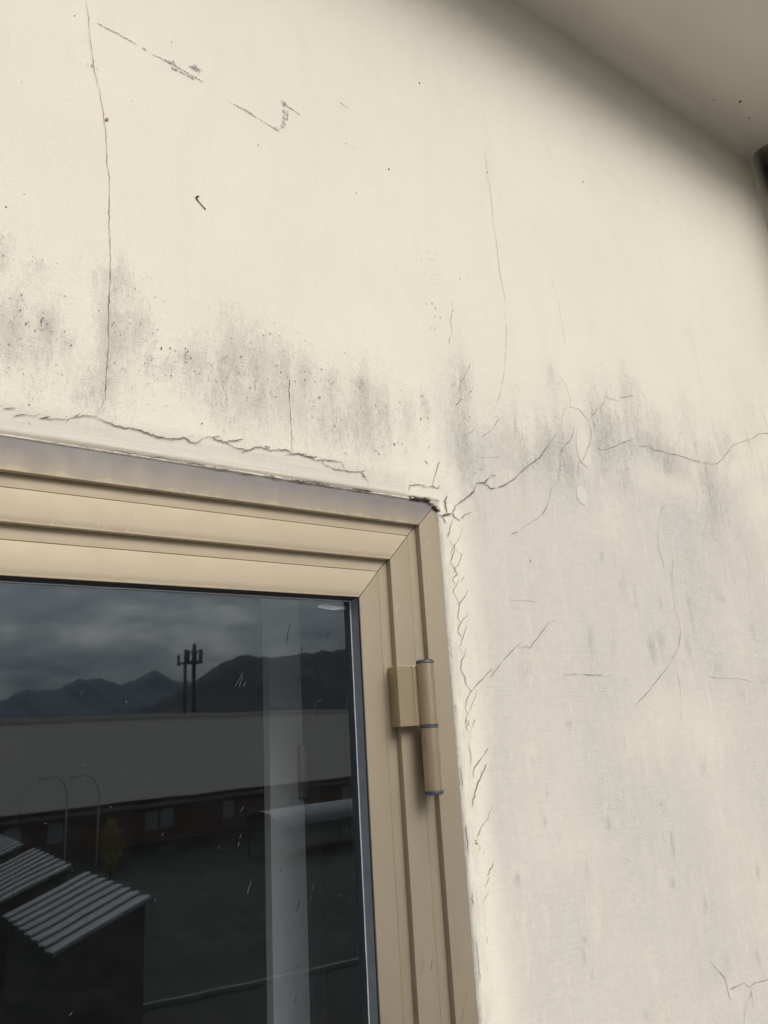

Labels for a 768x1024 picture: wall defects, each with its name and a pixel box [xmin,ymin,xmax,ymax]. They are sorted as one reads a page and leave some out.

leakage [128,315,373,441]
crack [4,16,768,835]